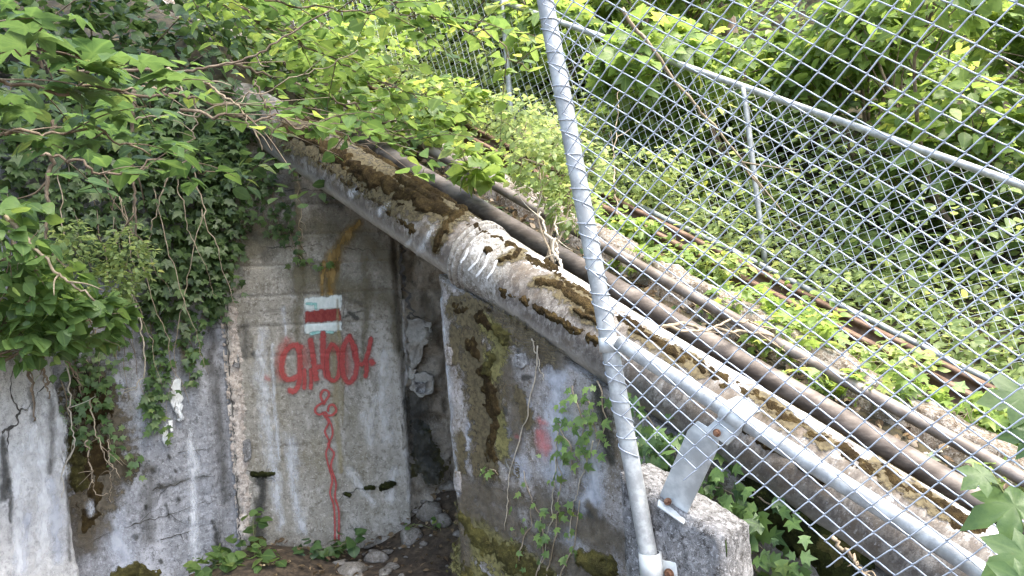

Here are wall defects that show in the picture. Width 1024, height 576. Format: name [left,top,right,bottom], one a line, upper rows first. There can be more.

rust [320,219,361,296]
water stain [460,248,498,279]
crack [1,368,54,456]
spalling [388,307,453,501]
water stain [550,369,569,477]
spalling [453,469,463,493]
water stain [578,433,599,518]